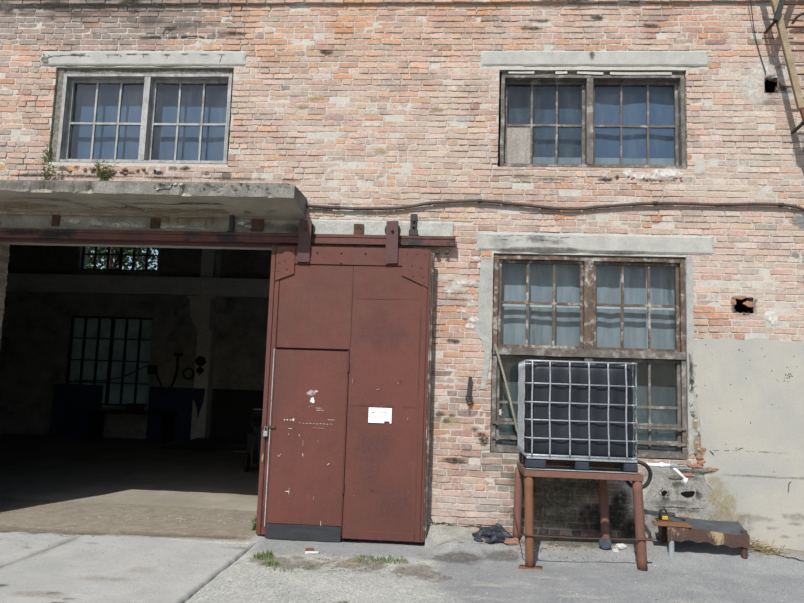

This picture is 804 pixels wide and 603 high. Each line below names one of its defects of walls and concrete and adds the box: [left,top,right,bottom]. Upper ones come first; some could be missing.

spalling [731,296,756,315]
flaking render [668,354,718,498]